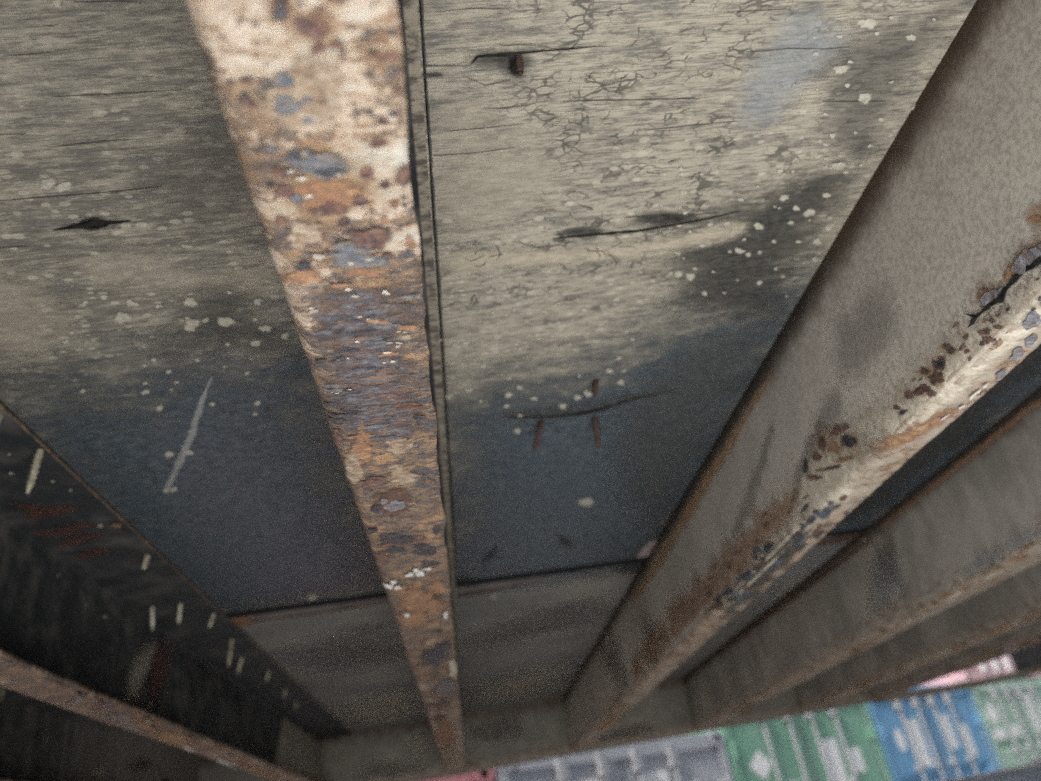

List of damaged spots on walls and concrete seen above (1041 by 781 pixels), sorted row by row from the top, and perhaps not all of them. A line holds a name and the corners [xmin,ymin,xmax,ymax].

rust [267,0,353,63]
crack [421,44,846,166]
water stain [833,61,853,88]
water stain [857,17,893,35]
crack [3,186,163,231]
rust [266,150,436,518]
crack [442,192,740,309]
water stain [419,0,848,599]
water stain [11,298,386,613]
crack [505,379,665,452]
rust [802,308,1010,480]
rust [366,525,448,627]